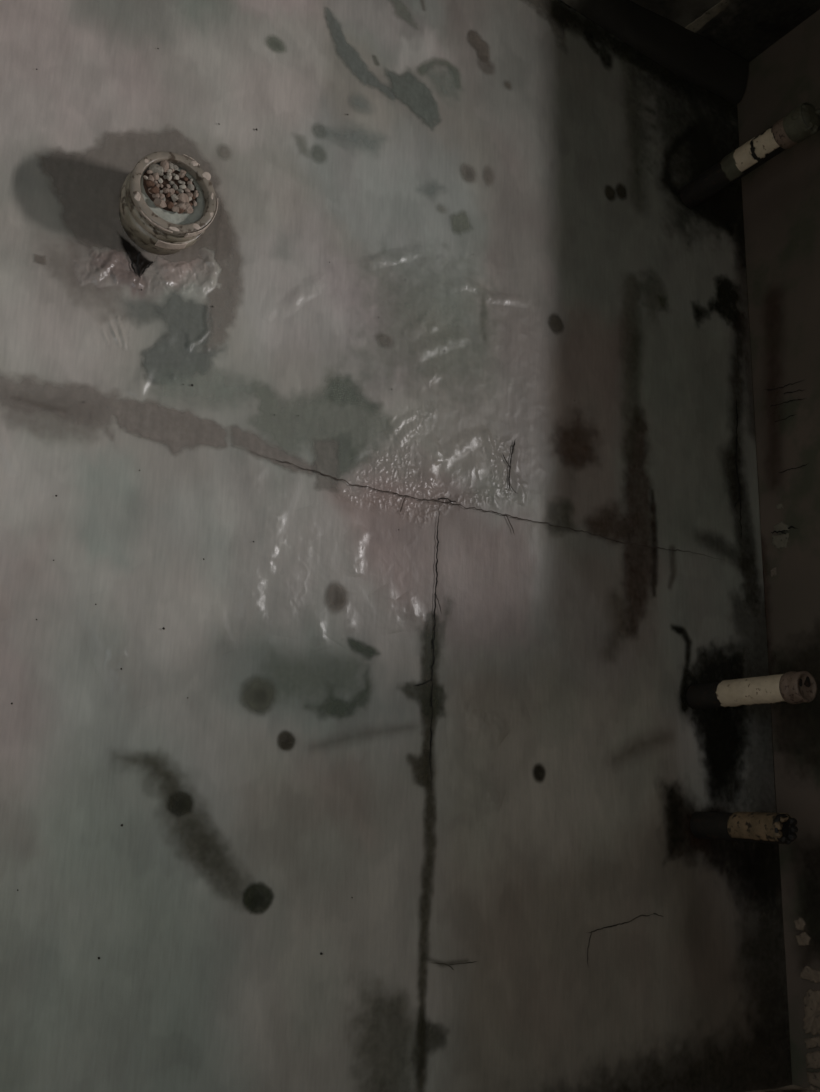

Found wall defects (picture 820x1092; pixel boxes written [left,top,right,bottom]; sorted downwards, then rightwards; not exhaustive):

leakage [327,8,459,127]
leakage [469,31,493,71]
leakage [0,126,388,489]
leakage [528,0,820,813]
leakage [327,584,346,609]
leakage [319,681,369,717]
leakage [349,639,378,657]
crack [230,439,731,792]
leakage [133,759,273,913]
crack [586,913,663,963]
spalling [800,966,820,1092]